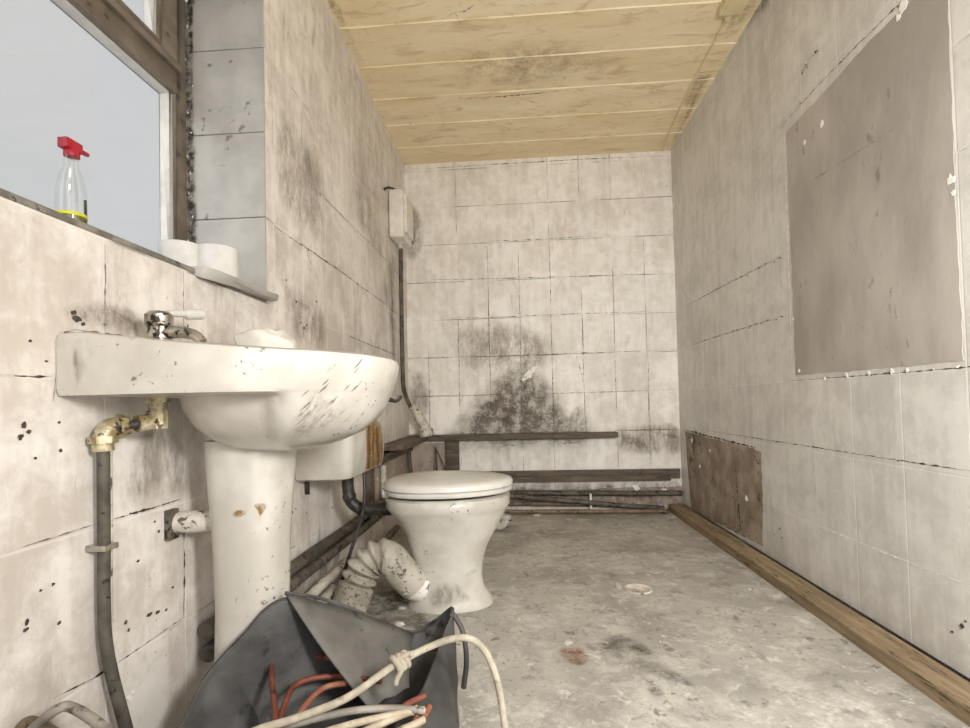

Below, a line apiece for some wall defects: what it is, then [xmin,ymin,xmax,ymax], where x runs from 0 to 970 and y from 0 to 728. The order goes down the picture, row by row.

flaking render [784,0,964,381]
crack [789,365,970,381]
flaking render [374,443,446,502]
peeling [547,430,782,546]